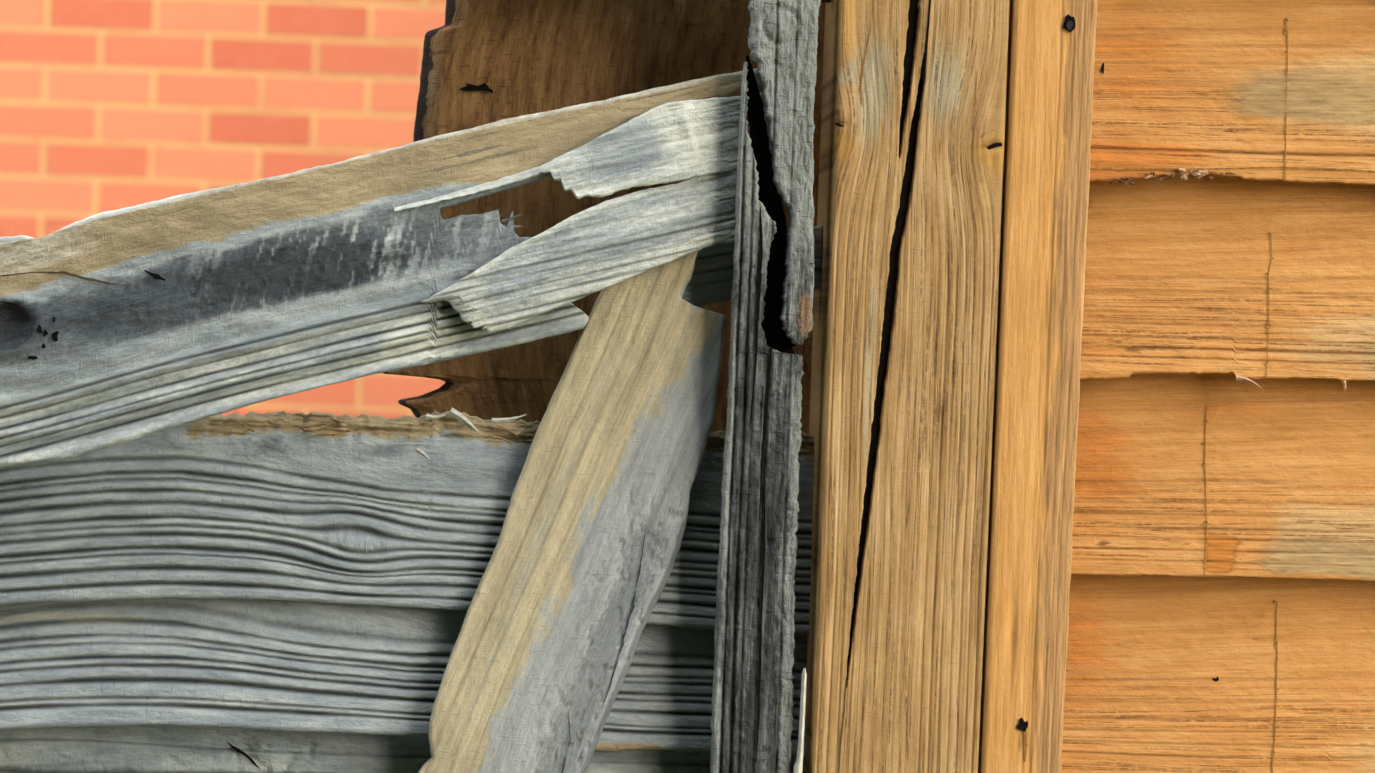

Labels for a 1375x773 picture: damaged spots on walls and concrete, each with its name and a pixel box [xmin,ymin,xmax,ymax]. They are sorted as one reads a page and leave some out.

crack [1090,18,1375,179]
peeling [425,408,527,434]
crack [835,0,931,773]
crack [1200,405,1208,576]
crack [1265,232,1274,378]
crack [1271,600,1279,773]